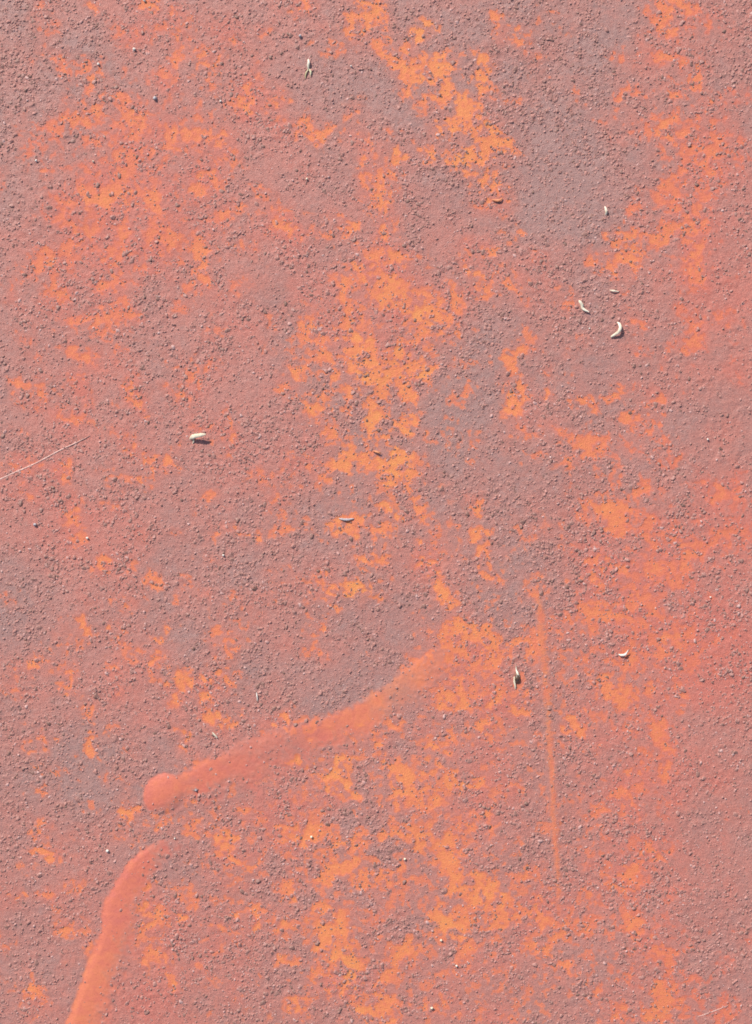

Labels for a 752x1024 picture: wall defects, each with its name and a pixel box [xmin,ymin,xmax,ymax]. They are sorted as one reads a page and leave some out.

corrosion [480,1,584,89]
corrosion [0,928,66,1024]